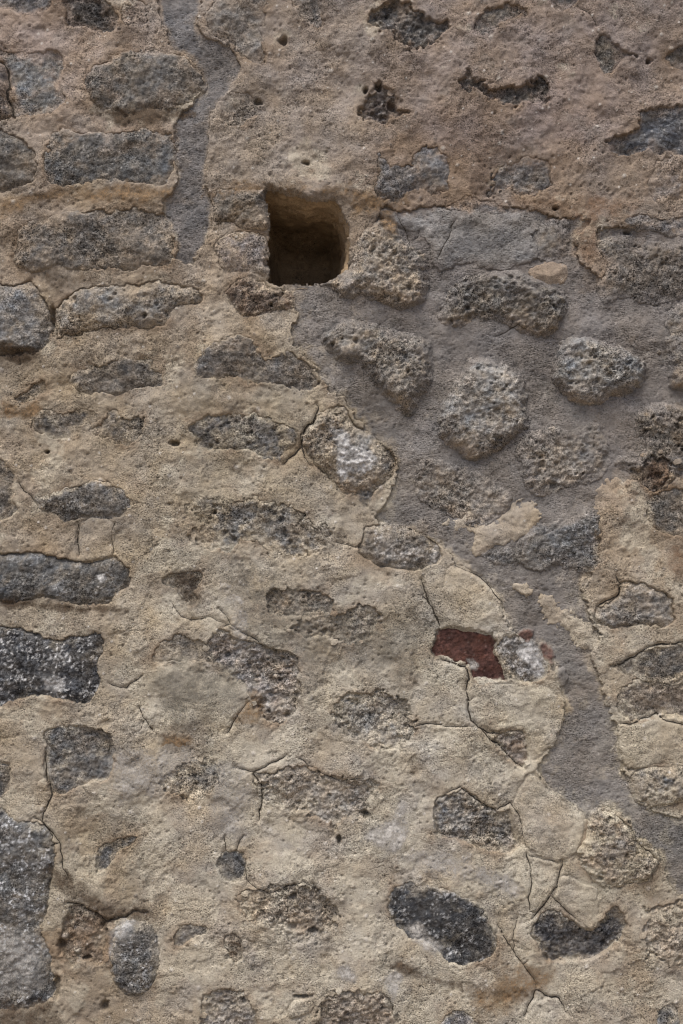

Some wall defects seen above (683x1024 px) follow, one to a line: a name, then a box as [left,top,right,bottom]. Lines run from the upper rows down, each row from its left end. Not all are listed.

spalling [637,449,682,492]
spalling [266,585,380,645]
crack [421,580,440,626]
crack [615,642,681,666]
spalling [331,688,417,751]
crack [417,660,522,767]
spalling [493,726,530,766]
crack [620,708,683,725]
crack [36,759,68,876]
spalling [252,764,380,830]
crack [444,786,573,1014]